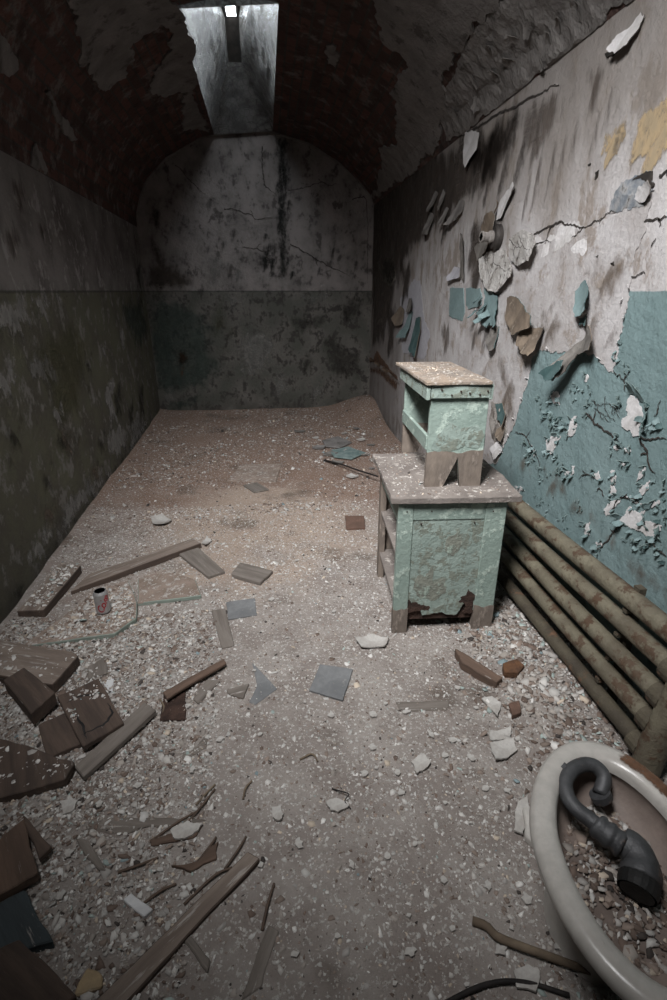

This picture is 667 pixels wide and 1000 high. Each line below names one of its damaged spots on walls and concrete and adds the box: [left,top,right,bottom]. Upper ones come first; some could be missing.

flaking render [0,33,19,77]
flaking render [66,0,210,132]
flaking render [371,0,633,199]
crack [459,84,559,137]
flaking render [605,12,645,58]
leakage [262,139,293,278]
crack [261,146,368,279]
crack [531,212,615,245]
crack [644,215,667,246]
peeling [391,98,667,565]